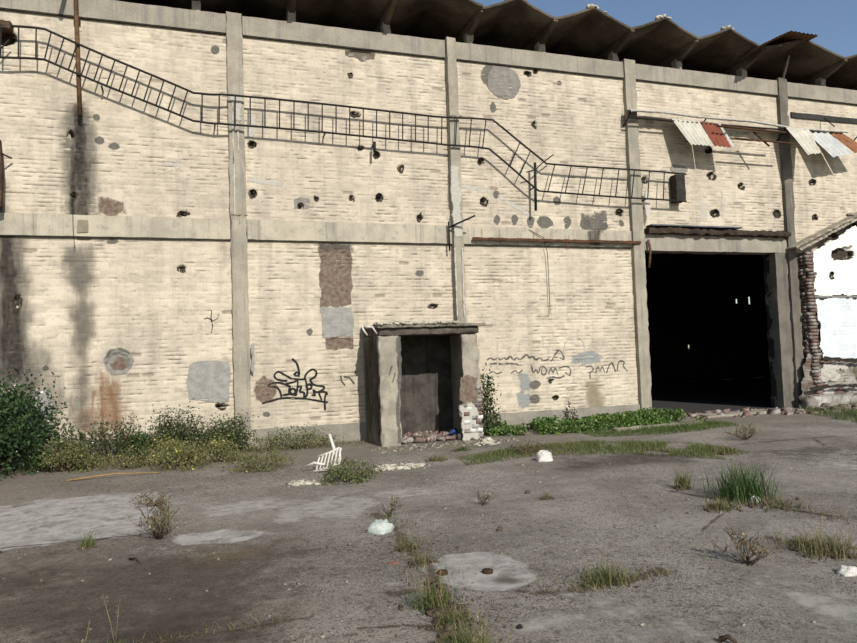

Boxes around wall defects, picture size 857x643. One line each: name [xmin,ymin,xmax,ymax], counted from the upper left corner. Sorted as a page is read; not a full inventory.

leakage [64,104,95,215]
leakage [0,236,50,431]
leakage [66,250,90,345]
peeling [318,242,353,307]
peeling [325,337,354,350]
spalling [797,252,849,396]
spalling [826,232,854,260]
leakage [77,372,90,427]
corrosion [93,383,120,433]